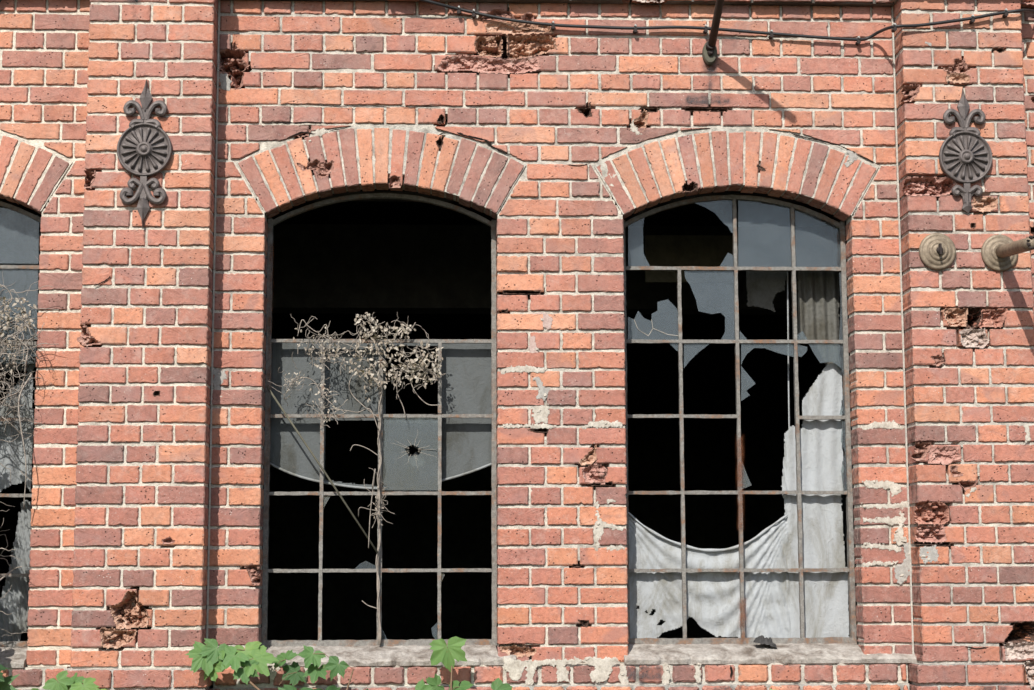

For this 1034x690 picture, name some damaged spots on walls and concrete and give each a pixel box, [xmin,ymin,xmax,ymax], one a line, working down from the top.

spalling [437,9,557,74]
spalling [217,43,250,90]
spalling [902,176,957,196]
spalling [941,308,1008,348]
spalling [579,445,608,484]
spalling [911,442,978,491]
spalling [100,591,149,649]
spalling [1002,621,1034,690]